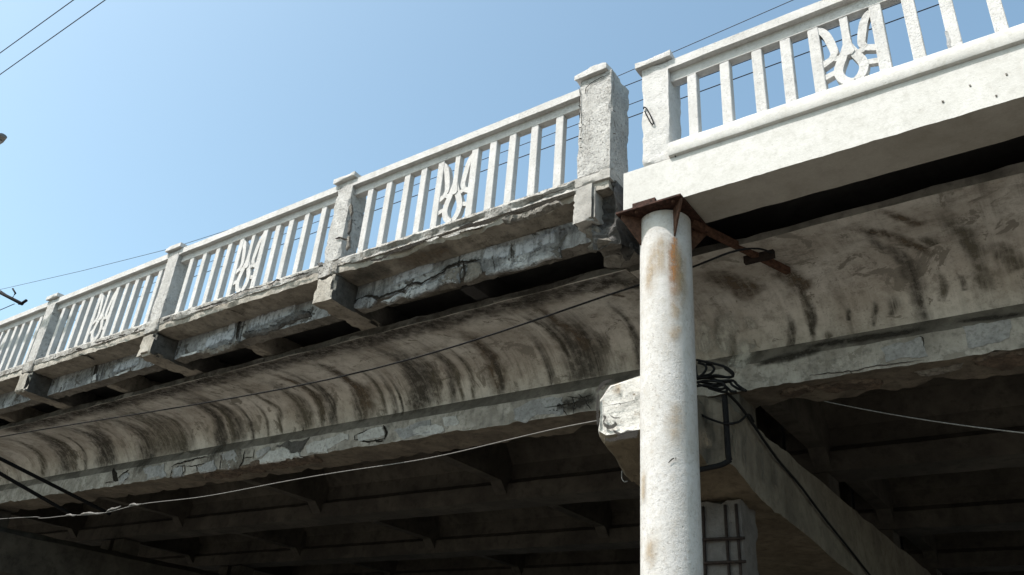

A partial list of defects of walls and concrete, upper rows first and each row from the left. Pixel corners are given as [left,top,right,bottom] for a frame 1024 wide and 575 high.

crack [354,244,512,302]
spalling [367,196,563,261]
spalling [585,180,640,268]
rust [658,237,684,283]
water stain [760,230,938,364]
water stain [947,222,1023,290]
water stain [960,313,1020,322]
water stain [8,267,640,475]
spalling [198,416,459,480]
peeling [513,397,563,423]
crack [545,394,639,416]
spalling [603,415,639,435]